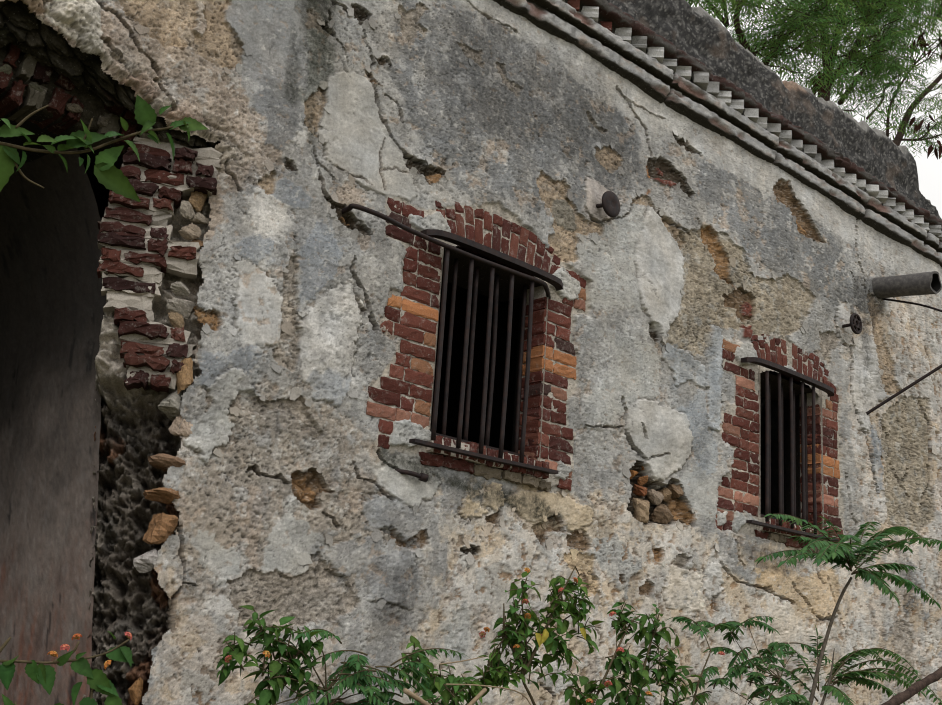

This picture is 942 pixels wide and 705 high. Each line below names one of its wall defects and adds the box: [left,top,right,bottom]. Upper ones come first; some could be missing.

spalling [119,0,252,74]
crack [313,0,445,201]
spalling [586,111,625,175]
spalling [646,156,696,200]
spalling [672,126,703,157]
spalling [536,170,937,535]
spalling [226,453,442,642]
crack [718,539,848,640]